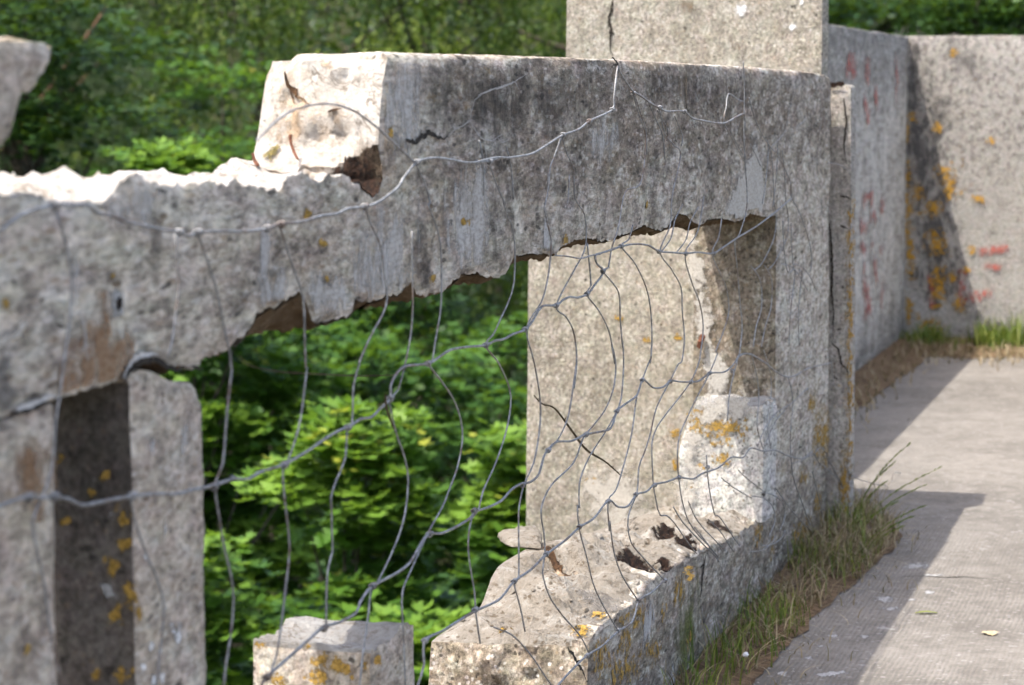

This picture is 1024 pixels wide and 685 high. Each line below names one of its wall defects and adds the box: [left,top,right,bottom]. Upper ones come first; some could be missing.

crack [607,0,619,74]
spalling [331,126,403,197]
crack [406,73,528,155]
crack [841,98,849,159]
peeling [430,164,490,295]
peeling [510,145,771,515]
crack [829,223,849,380]